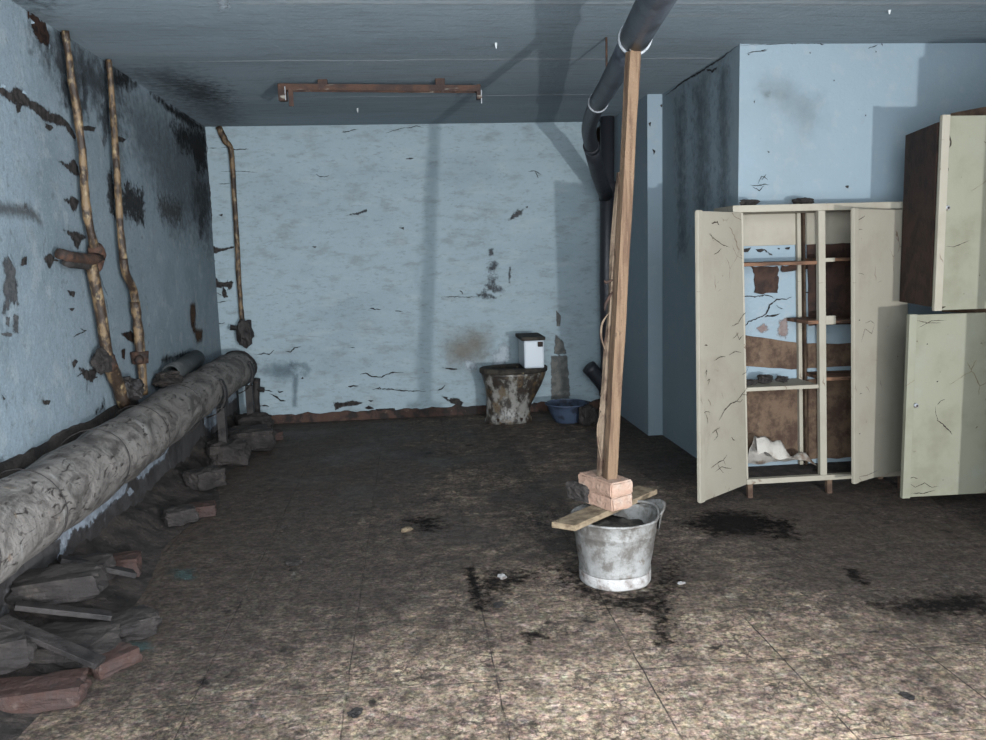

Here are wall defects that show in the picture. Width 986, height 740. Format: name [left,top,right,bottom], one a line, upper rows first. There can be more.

spalling [28,11,62,49]
spalling [0,81,96,139]
damp [150,93,210,236]
peeling [1,254,27,337]
damp [493,344,510,365]
damp [681,509,801,540]
damp [464,567,535,612]
damp [547,563,681,645]
damp [871,590,986,617]